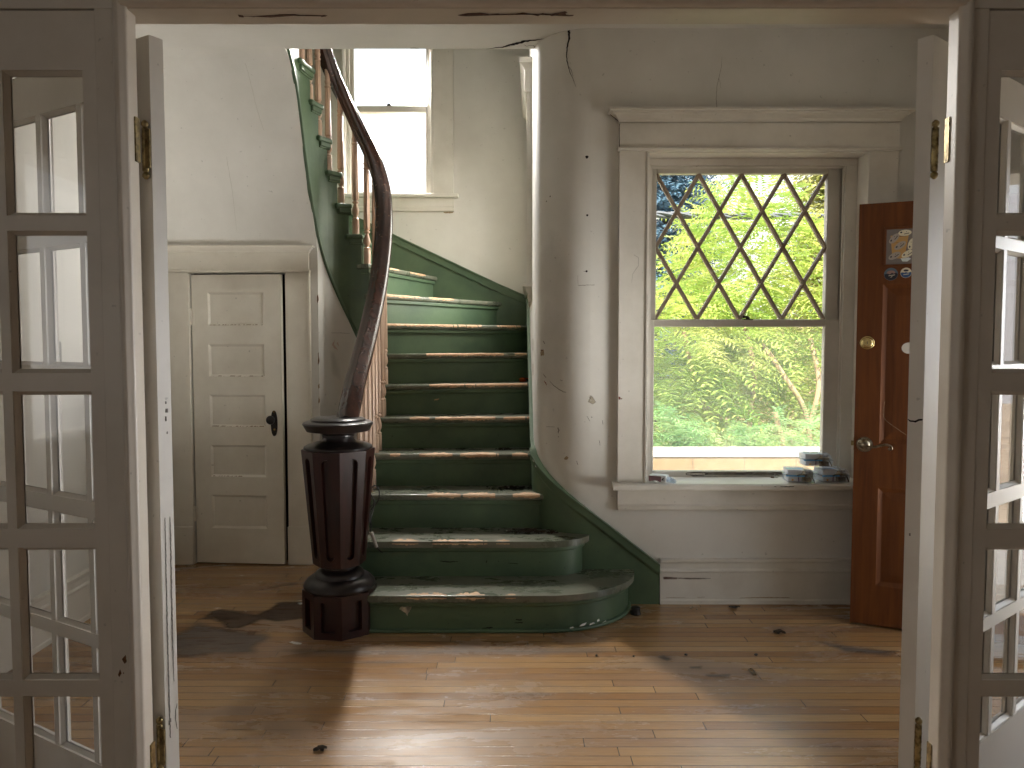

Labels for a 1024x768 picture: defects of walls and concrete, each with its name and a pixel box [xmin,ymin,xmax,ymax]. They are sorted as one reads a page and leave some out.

crack [489,39,541,49]
crack [566,30,576,86]
peeling [419,449,536,467]
peeling [400,592,485,615]
water stain [177,602,302,656]